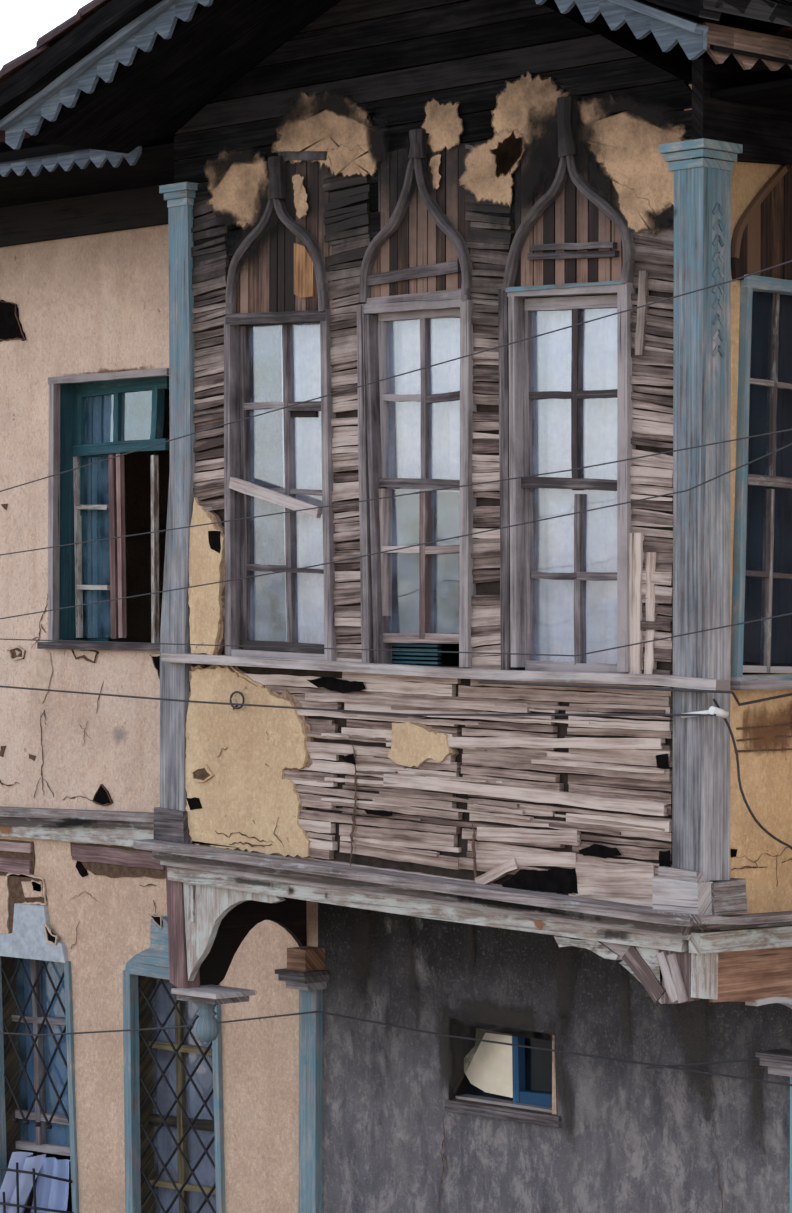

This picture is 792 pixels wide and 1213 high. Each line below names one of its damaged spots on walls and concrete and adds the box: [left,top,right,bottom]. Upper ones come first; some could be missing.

flaking render [191,198,231,513]
flaking render [230,129,674,907]
spalling [208,531,221,553]
crack [31,594,48,649]
damp [743,707,792,737]
spalling [190,764,214,782]
spalling [186,797,202,810]
crack [732,847,792,885]
spalling [0,839,47,934]
spalling [44,923,58,945]